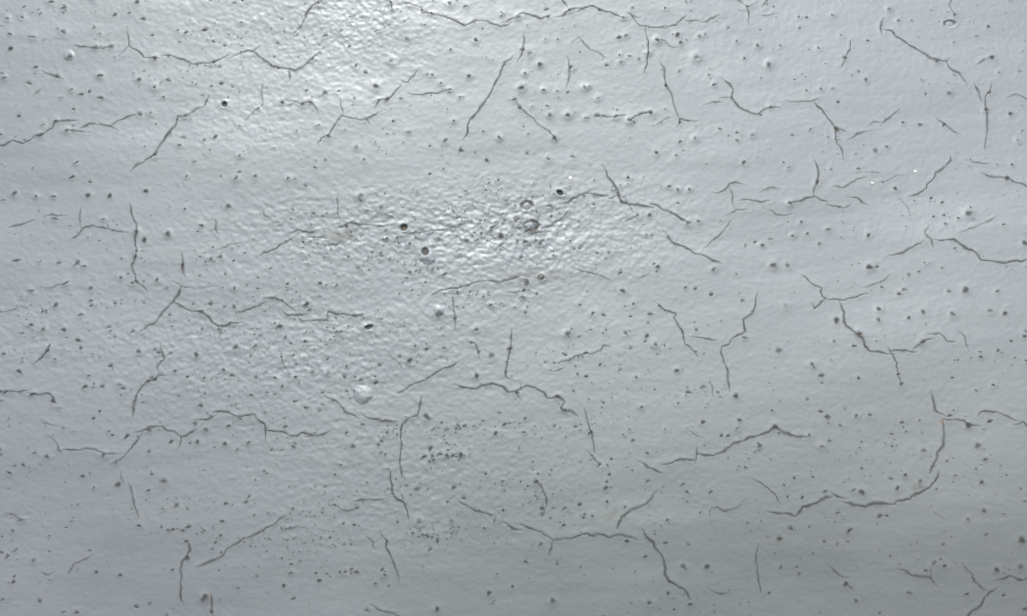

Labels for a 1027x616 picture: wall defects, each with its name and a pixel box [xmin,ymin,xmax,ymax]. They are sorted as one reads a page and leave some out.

crack [534,176,719,261]
crack [899,239,1026,263]
crack [146,266,358,331]
crack [661,299,756,387]
crack [807,279,967,381]
crack [130,352,325,449]
crack [330,333,564,514]
crack [645,427,804,472]
crack [763,441,944,516]
crack [470,501,688,594]